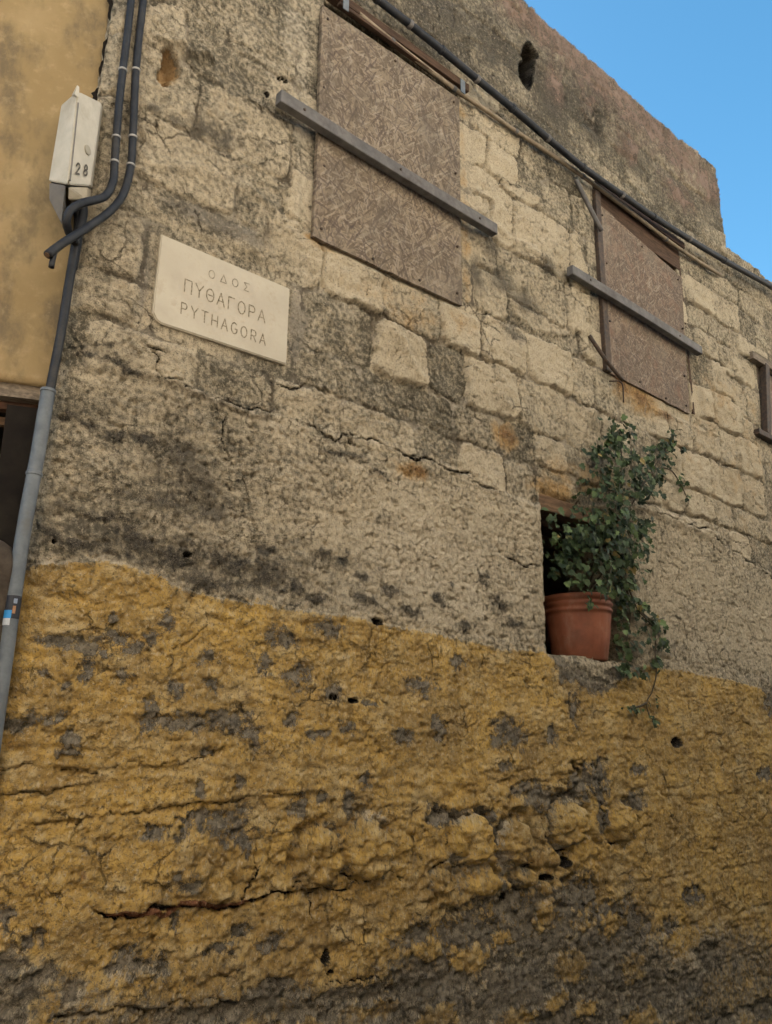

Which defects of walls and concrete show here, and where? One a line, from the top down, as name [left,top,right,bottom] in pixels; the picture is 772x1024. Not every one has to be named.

spalling [156,48,178,87]
crack [148,347,264,468]
spalling [195,649,224,695]
spalling [136,679,267,760]
spalling [138,774,262,861]
crack [93,849,401,920]
spalling [94,940,168,989]
spalling [156,867,725,1024]
spalling [711,992,772,1024]